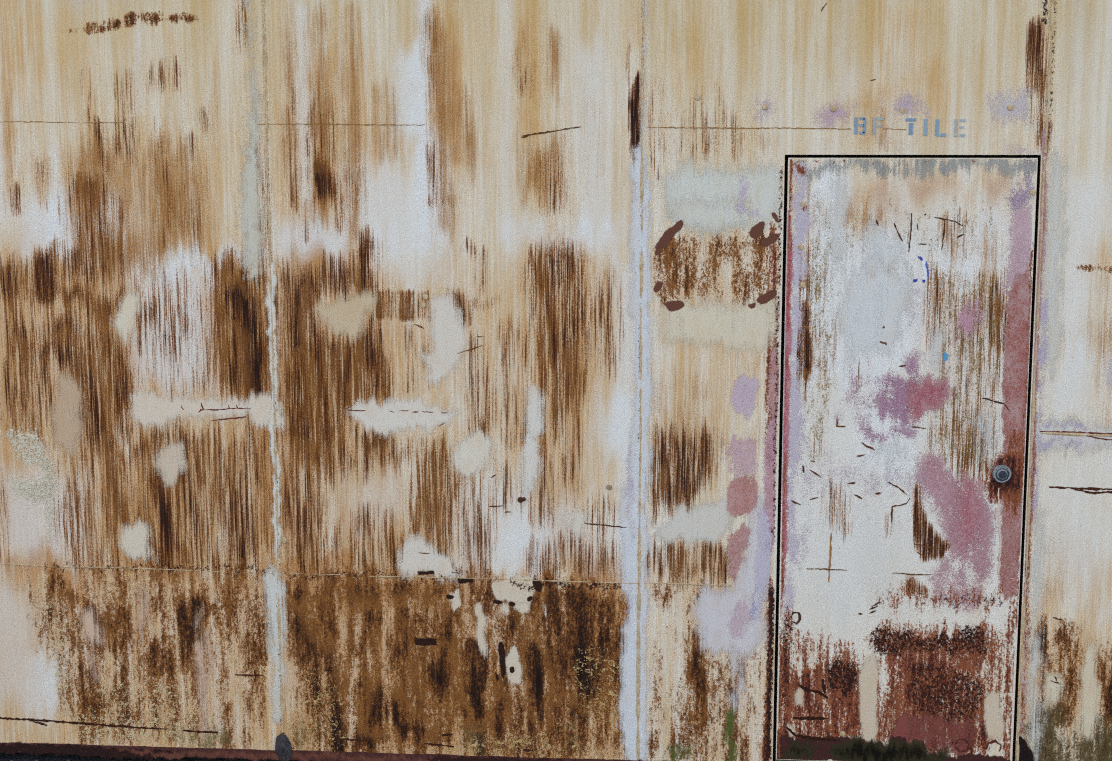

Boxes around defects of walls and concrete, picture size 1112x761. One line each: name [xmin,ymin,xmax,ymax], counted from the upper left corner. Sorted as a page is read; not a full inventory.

rust [0,0,631,761]
peeling [653,281,684,312]
rust [626,44,742,180]
rust [638,159,1112,761]
peeling [725,85,1087,736]
rust [1025,0,1057,151]